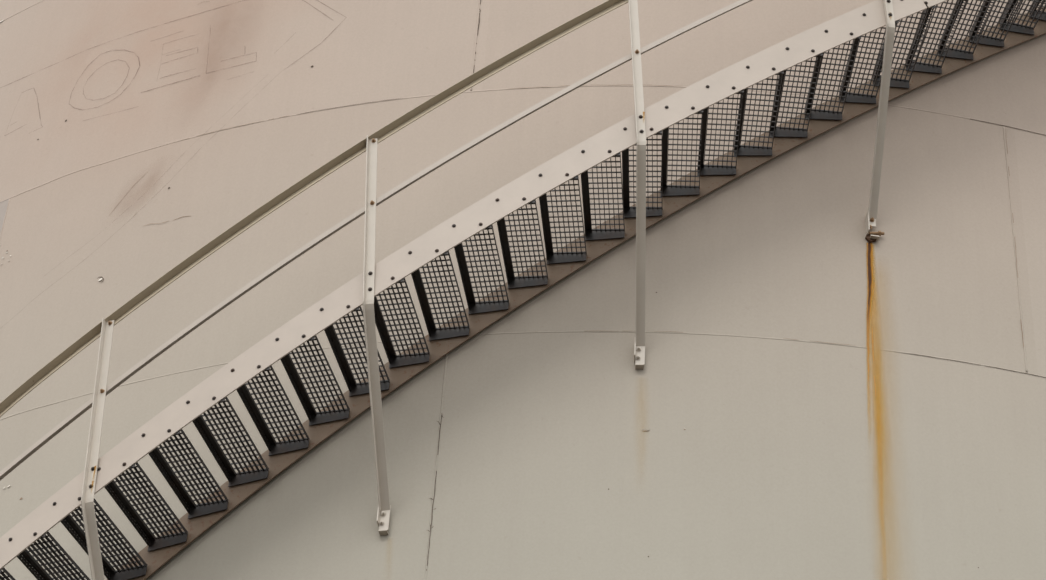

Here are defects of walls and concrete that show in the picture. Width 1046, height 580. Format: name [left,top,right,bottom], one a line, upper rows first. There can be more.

corrosion [867,242,877,398]